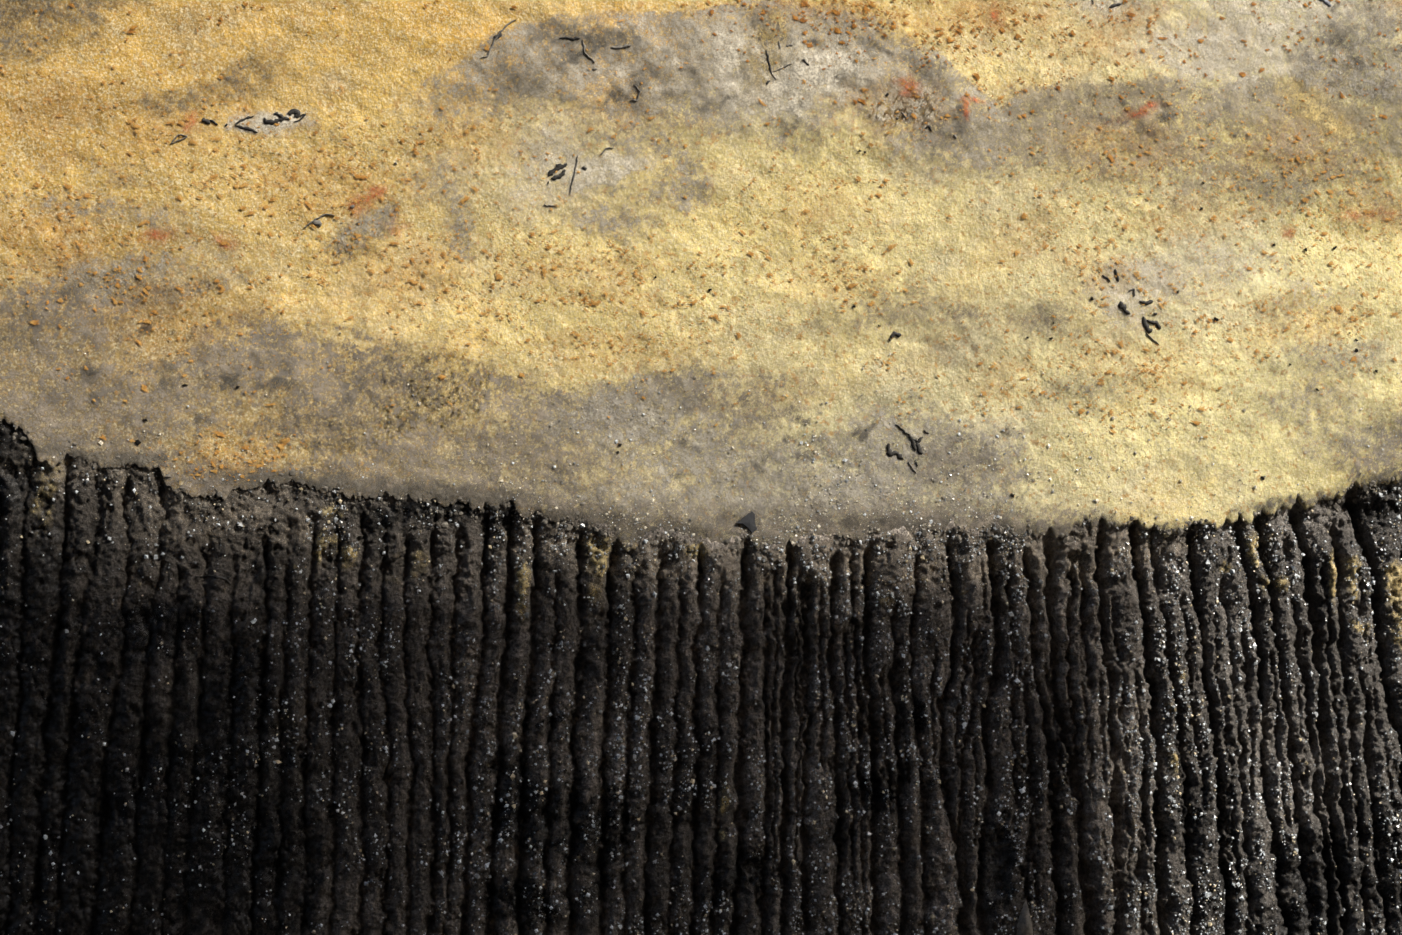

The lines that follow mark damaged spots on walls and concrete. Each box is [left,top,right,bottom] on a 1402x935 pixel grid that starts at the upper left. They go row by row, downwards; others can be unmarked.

rust [0,0,1402,449]
water stain [418,0,1402,241]
water stain [0,187,1201,614]
spalling [736,511,757,533]
peeling [886,424,929,473]
spalling [977,811,1033,935]